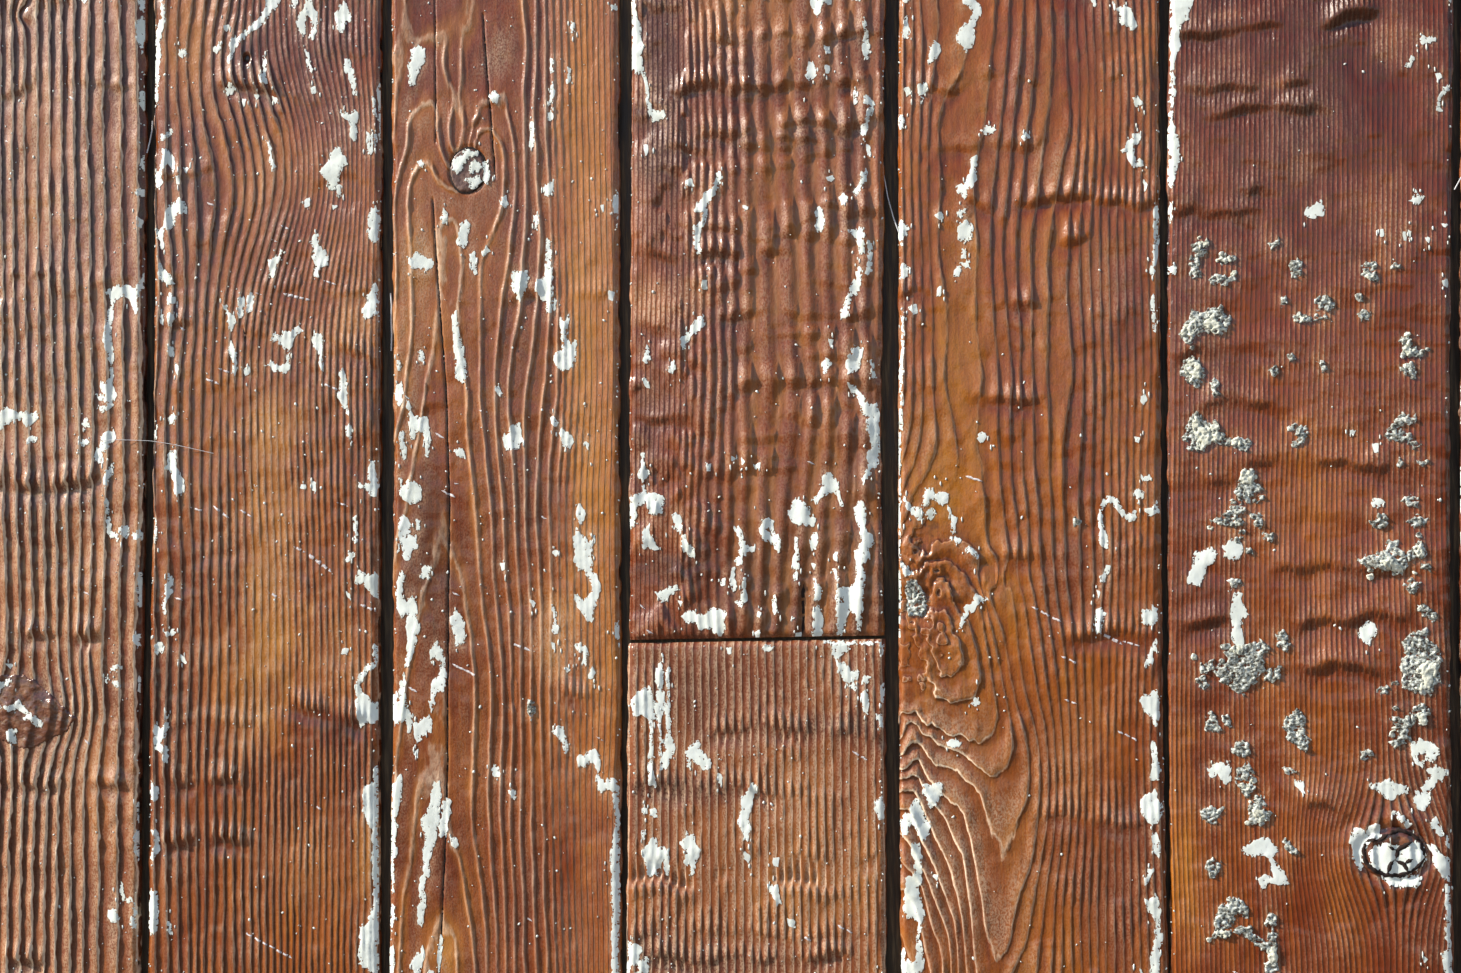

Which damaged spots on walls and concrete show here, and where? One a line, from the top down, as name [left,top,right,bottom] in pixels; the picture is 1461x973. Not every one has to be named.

peeling [1150,0,1237,287]
peeling [80,129,187,543]
peeling [357,765,443,973]
peeling [345,478,467,742]
peeling [417,780,459,927]
peeling [551,725,649,973]
peeling [630,661,723,788]
peeling [681,315,979,728]
peeling [874,782,943,973]
peeling [1139,689,1163,973]
spalling [1181,411,1291,697]
peeling [1349,494,1453,973]